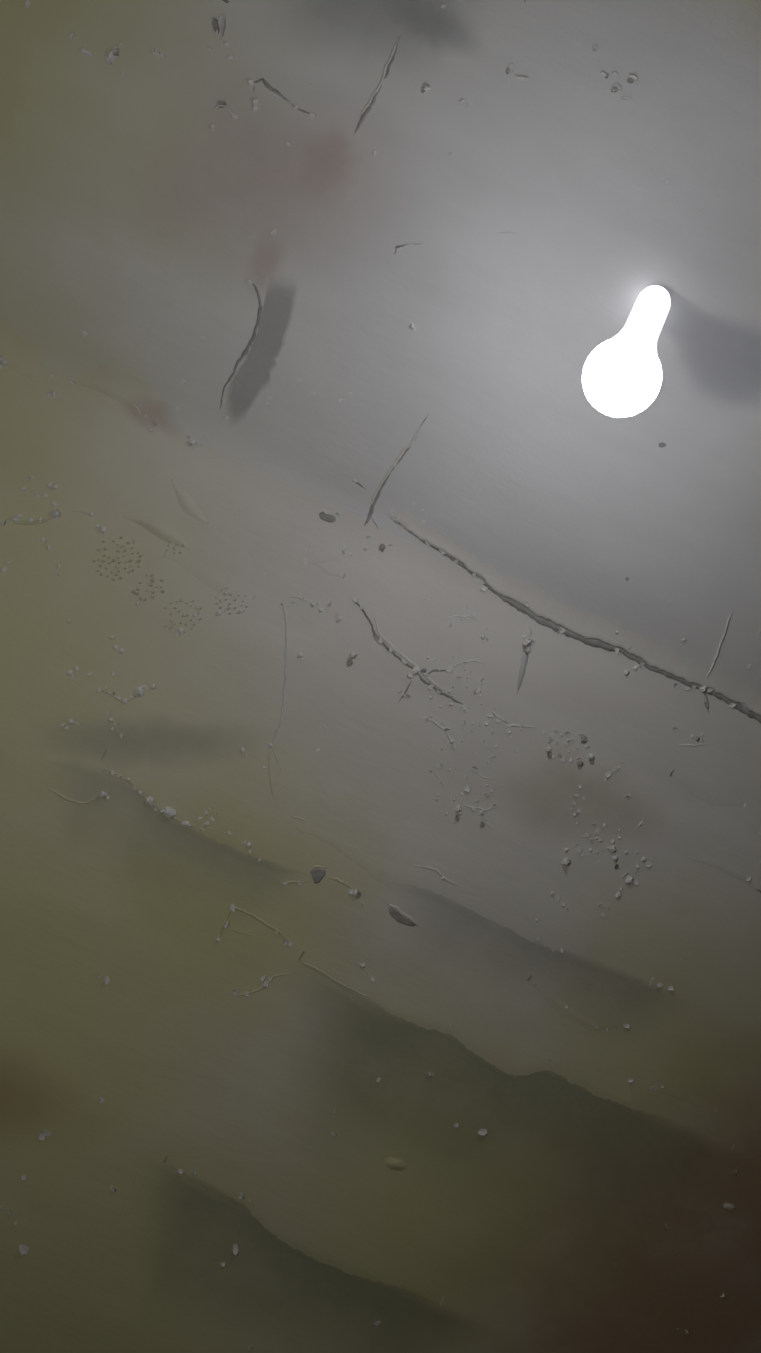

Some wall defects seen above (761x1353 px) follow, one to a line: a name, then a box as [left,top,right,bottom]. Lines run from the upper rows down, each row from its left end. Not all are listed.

crack [352,412,761,723]